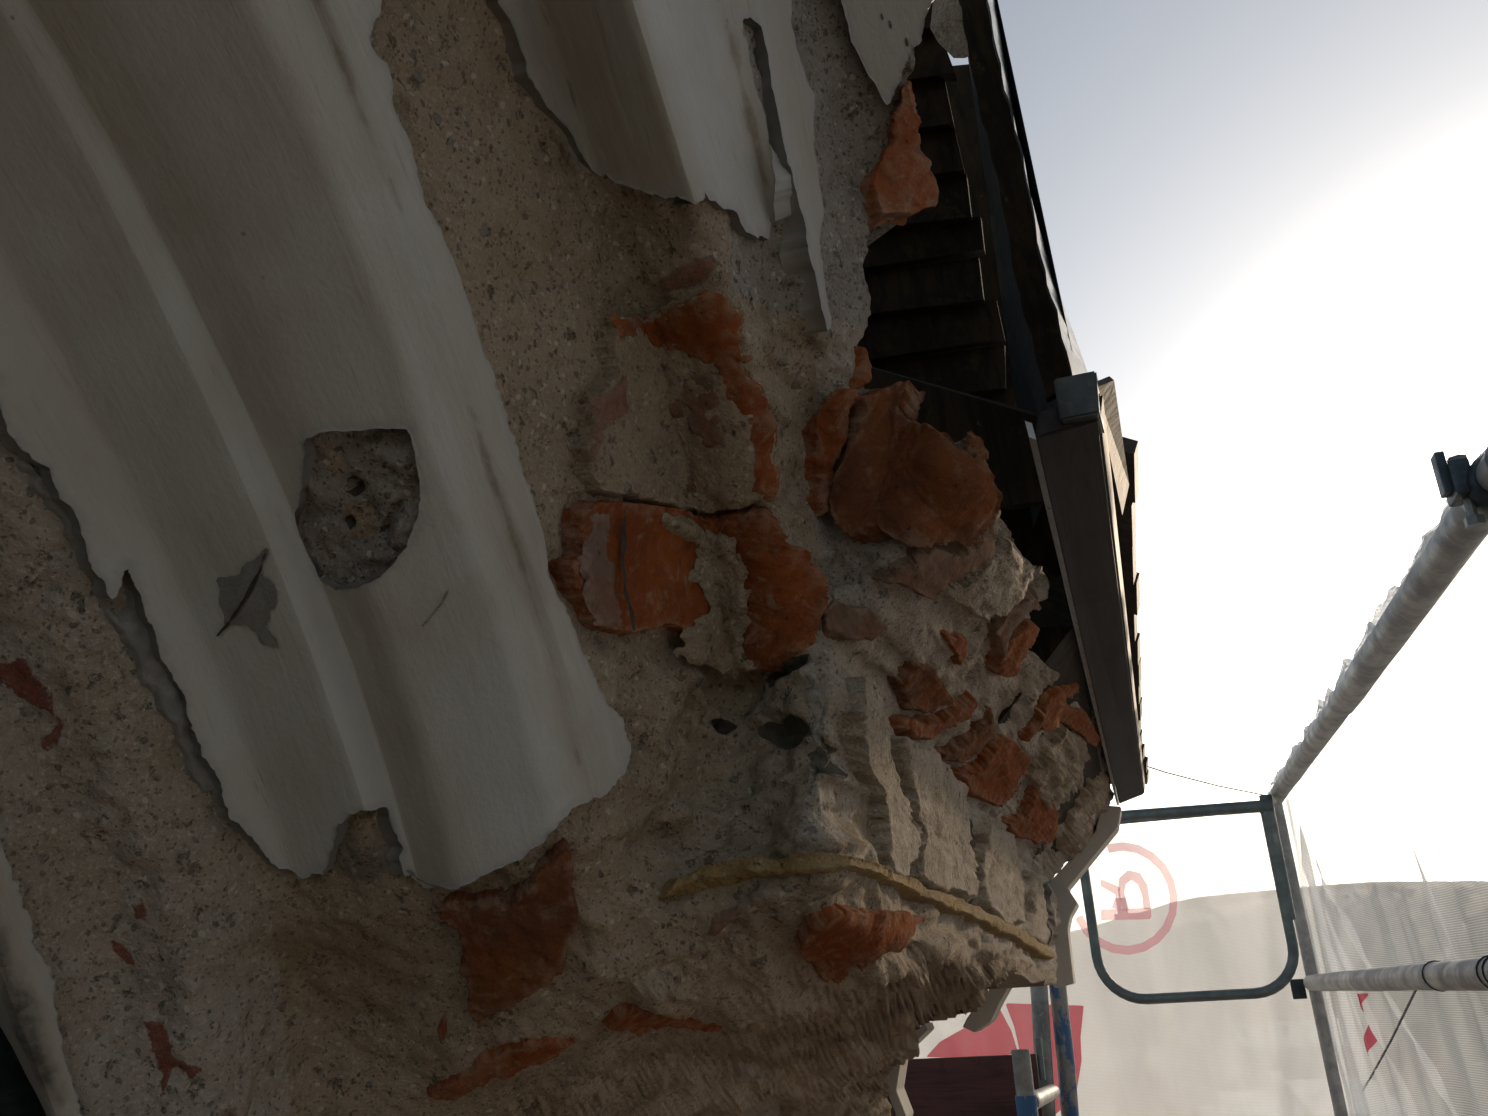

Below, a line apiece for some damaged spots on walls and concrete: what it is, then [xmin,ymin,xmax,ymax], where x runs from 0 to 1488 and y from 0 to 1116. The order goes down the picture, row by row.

spalling [0,0,1114,1116]